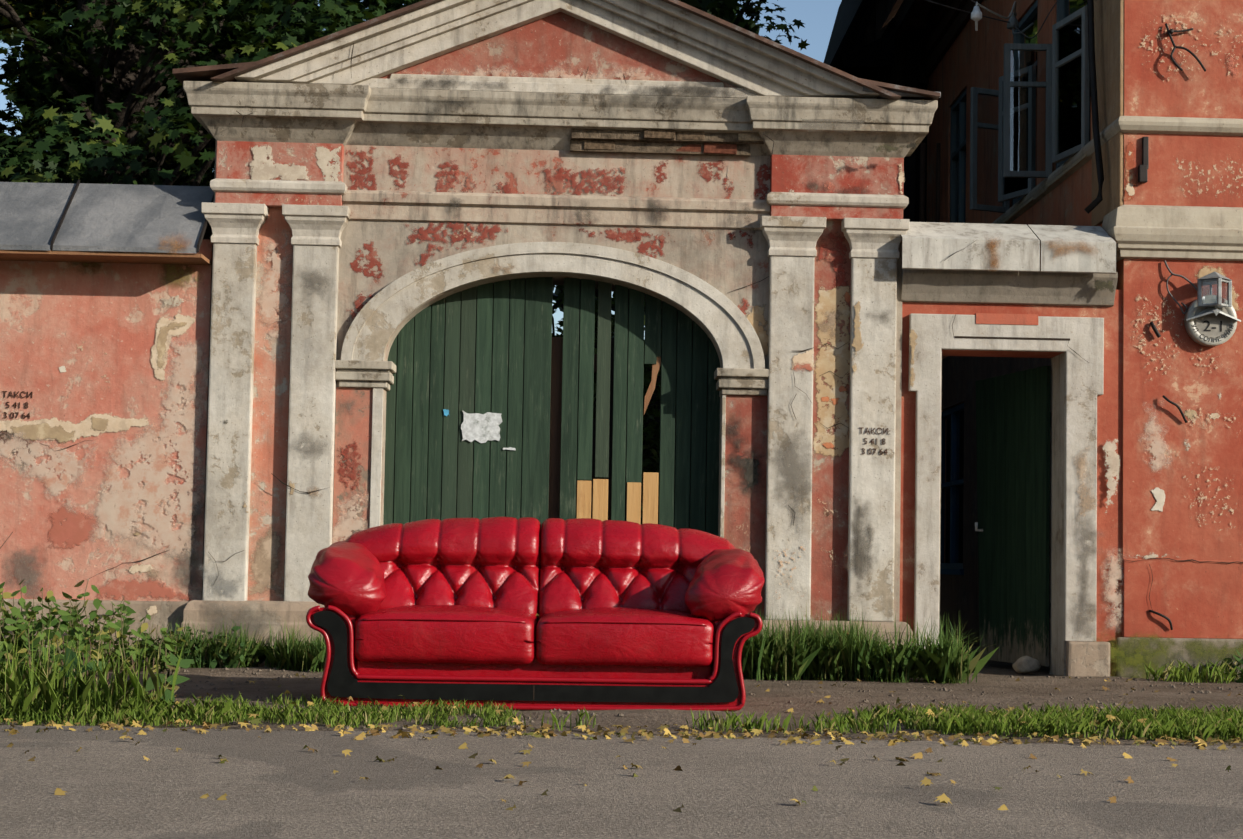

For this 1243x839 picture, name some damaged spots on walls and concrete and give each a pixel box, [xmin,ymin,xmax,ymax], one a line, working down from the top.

peeling [434,160,476,193]
peeling [492,182,512,194]
spalling [542,129,771,200]
peeling [406,222,508,266]
peeling [791,232,863,458]
peeling [0,295,204,615]
peeling [332,442,367,544]
peeling [1076,439,1121,515]
peeling [1103,553,1166,626]